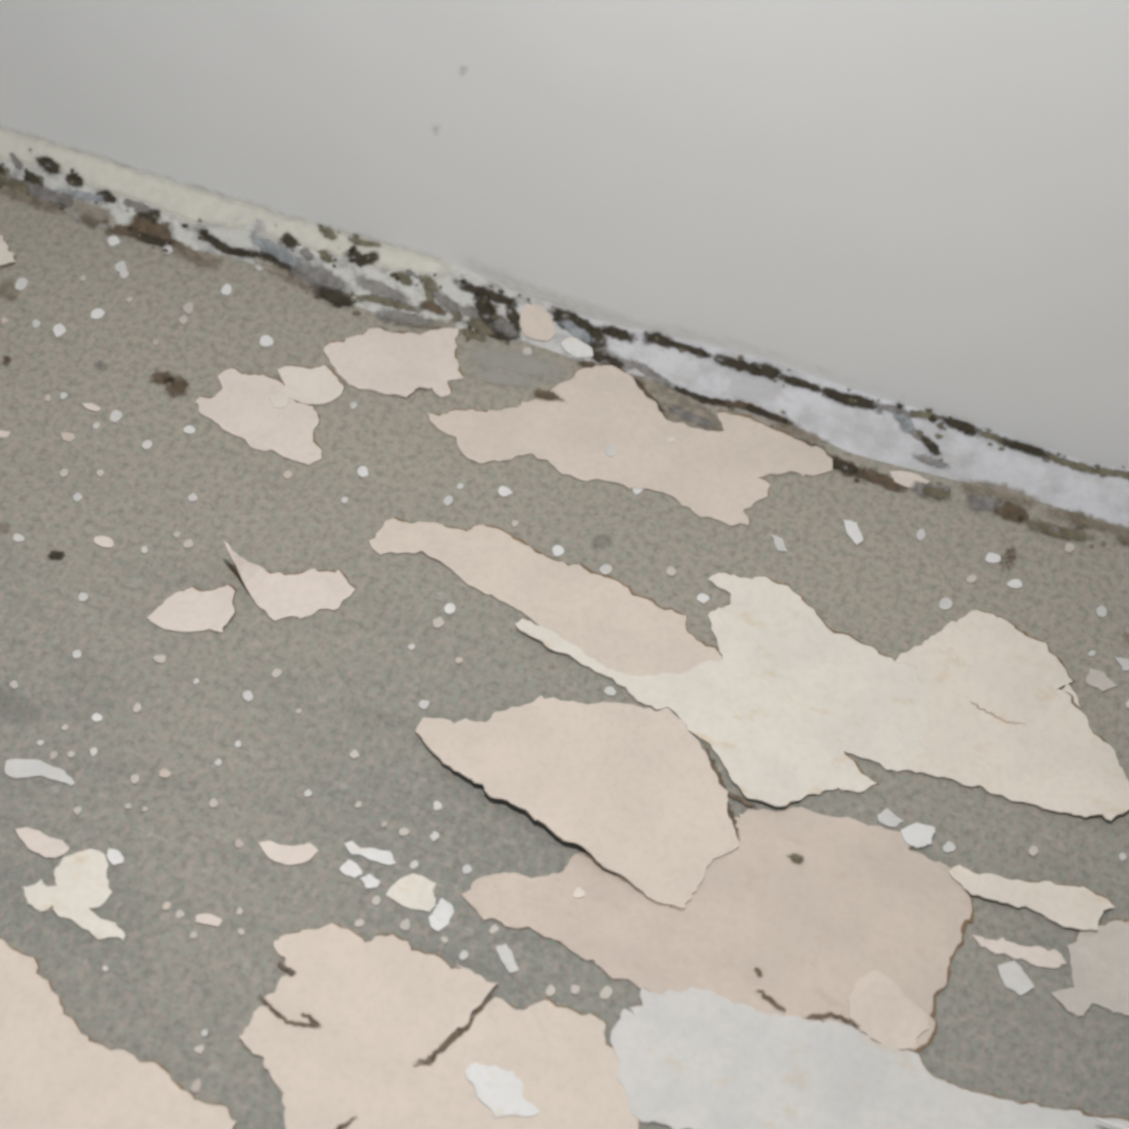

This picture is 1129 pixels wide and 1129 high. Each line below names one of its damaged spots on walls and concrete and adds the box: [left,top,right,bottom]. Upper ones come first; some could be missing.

leakage [0,129,531,345]
peeling [195,326,834,526]
leakage [534,388,563,400]
leakage [552,306,1129,501]
leakage [964,482,1129,547]
peeling [147,541,356,634]
peeling [239,517,1129,1129]
peeling [0,937,238,1129]
crack [277,962,296,974]
crack [259,995,320,1028]
crack [418,994,492,1064]
crack [336,1117,355,1129]